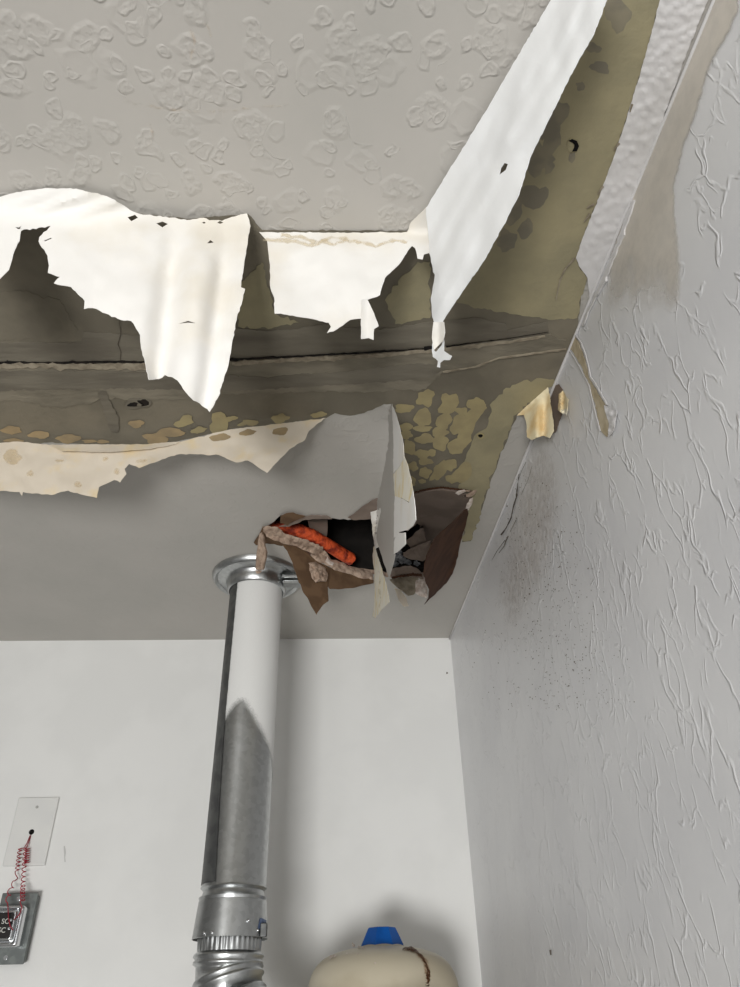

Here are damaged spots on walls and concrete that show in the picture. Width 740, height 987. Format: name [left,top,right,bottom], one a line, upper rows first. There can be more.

peeling [0,0,660,542]
spalling [323,518,425,572]